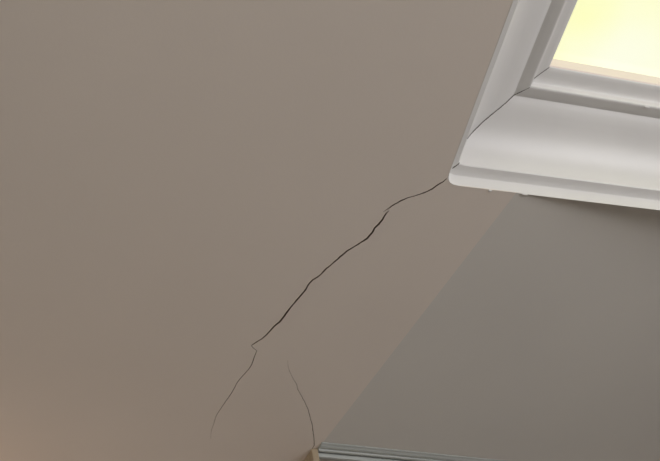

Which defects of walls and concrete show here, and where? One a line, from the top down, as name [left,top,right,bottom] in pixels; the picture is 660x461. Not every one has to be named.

crack [467,68,548,139]
crack [211,163,459,430]